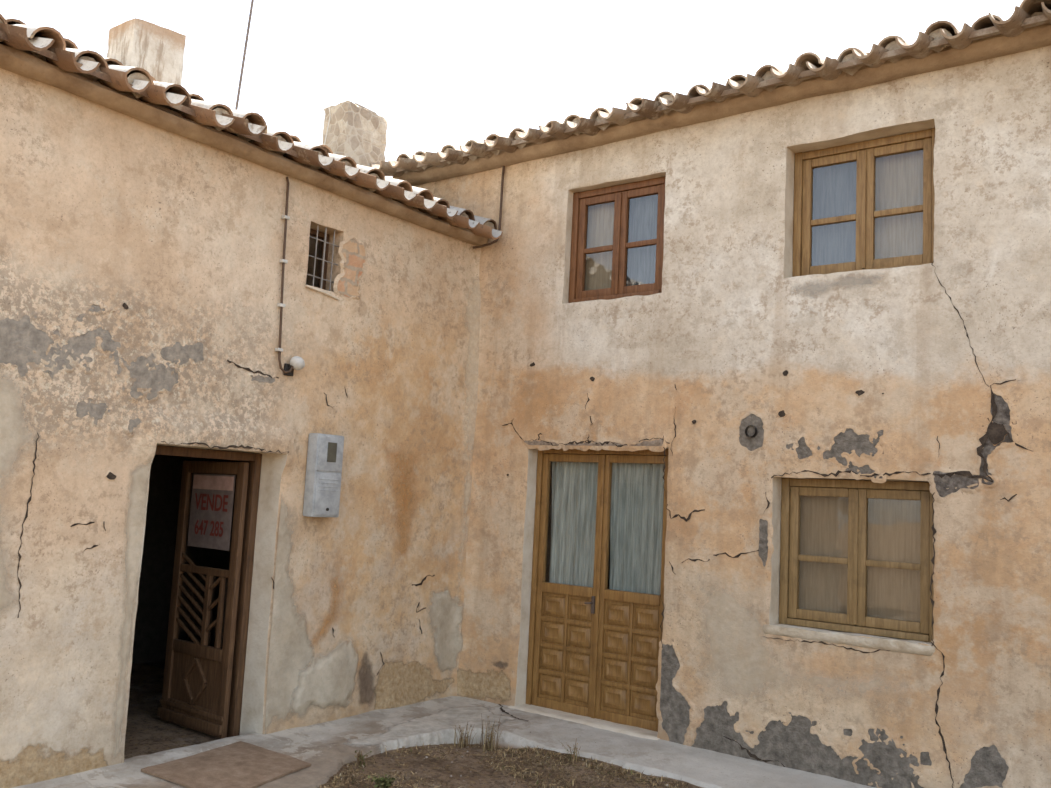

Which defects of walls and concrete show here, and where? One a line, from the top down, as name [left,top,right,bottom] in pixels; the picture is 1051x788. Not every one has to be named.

spalling [0,300,207,438]
crack [227,357,279,379]
crack [502,385,705,522]
spalling [736,409,787,455]
spalling [782,424,887,483]
spalling [986,422,1008,446]
crack [17,431,43,618]
spalling [755,516,774,570]
crack [761,262,1031,788]
crack [660,548,759,648]
spalling [656,639,938,788]
spalling [956,740,1012,788]